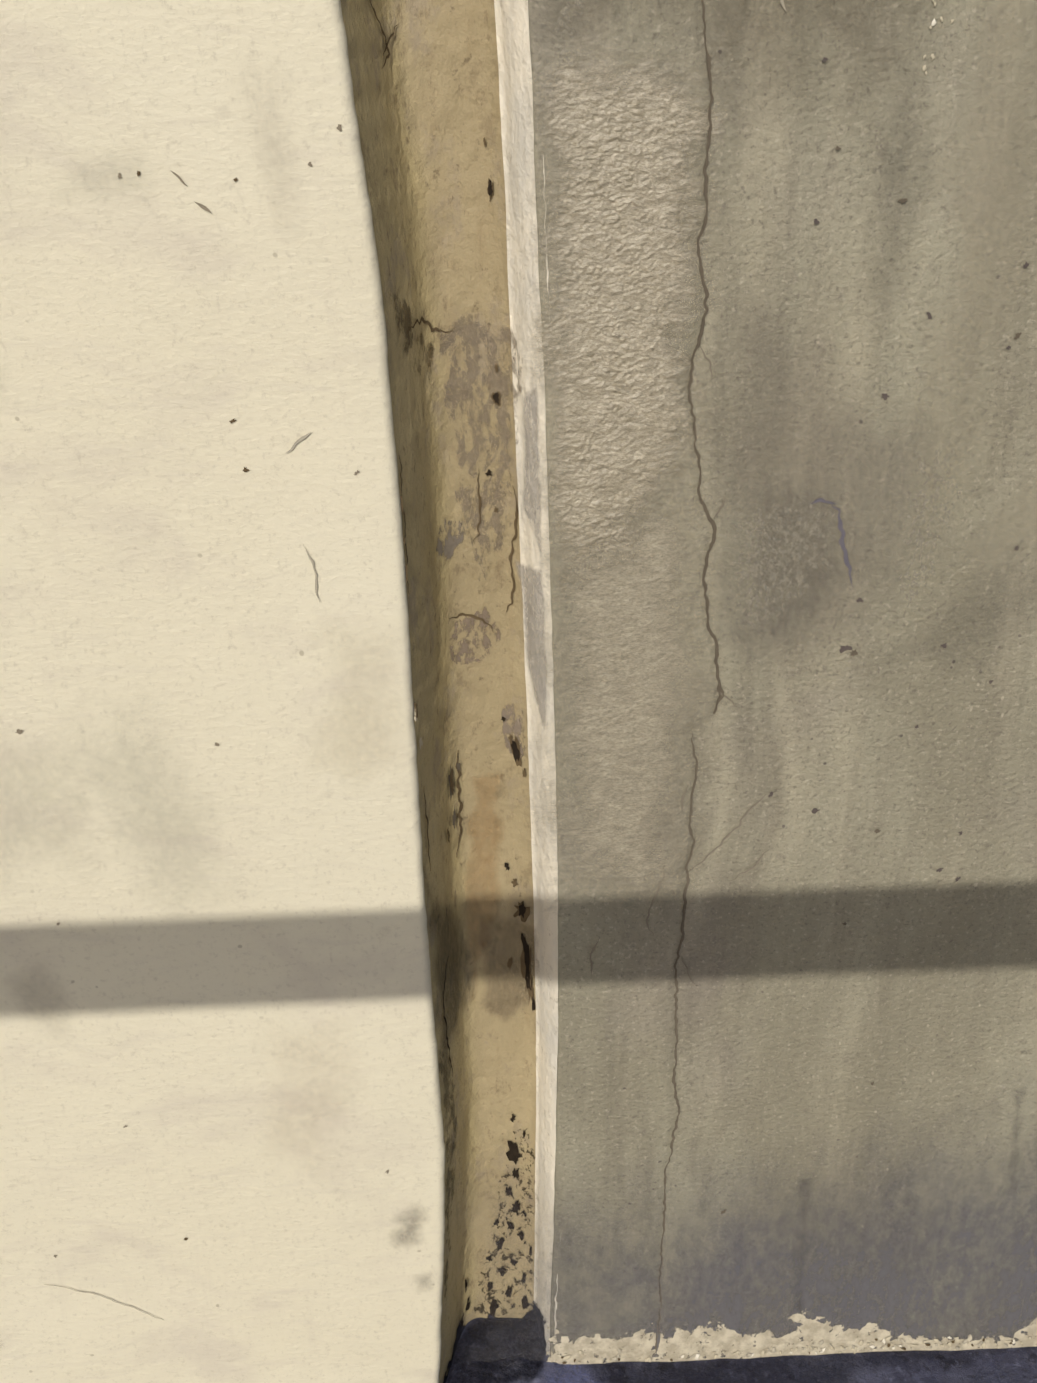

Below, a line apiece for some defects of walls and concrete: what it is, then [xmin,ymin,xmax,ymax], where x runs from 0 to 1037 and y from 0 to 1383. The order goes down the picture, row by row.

spalling [491,391,501,406]
crack [646,0,777,1354]
mould [461,1114,536,1326]
peeling [546,1311,1037,1383]